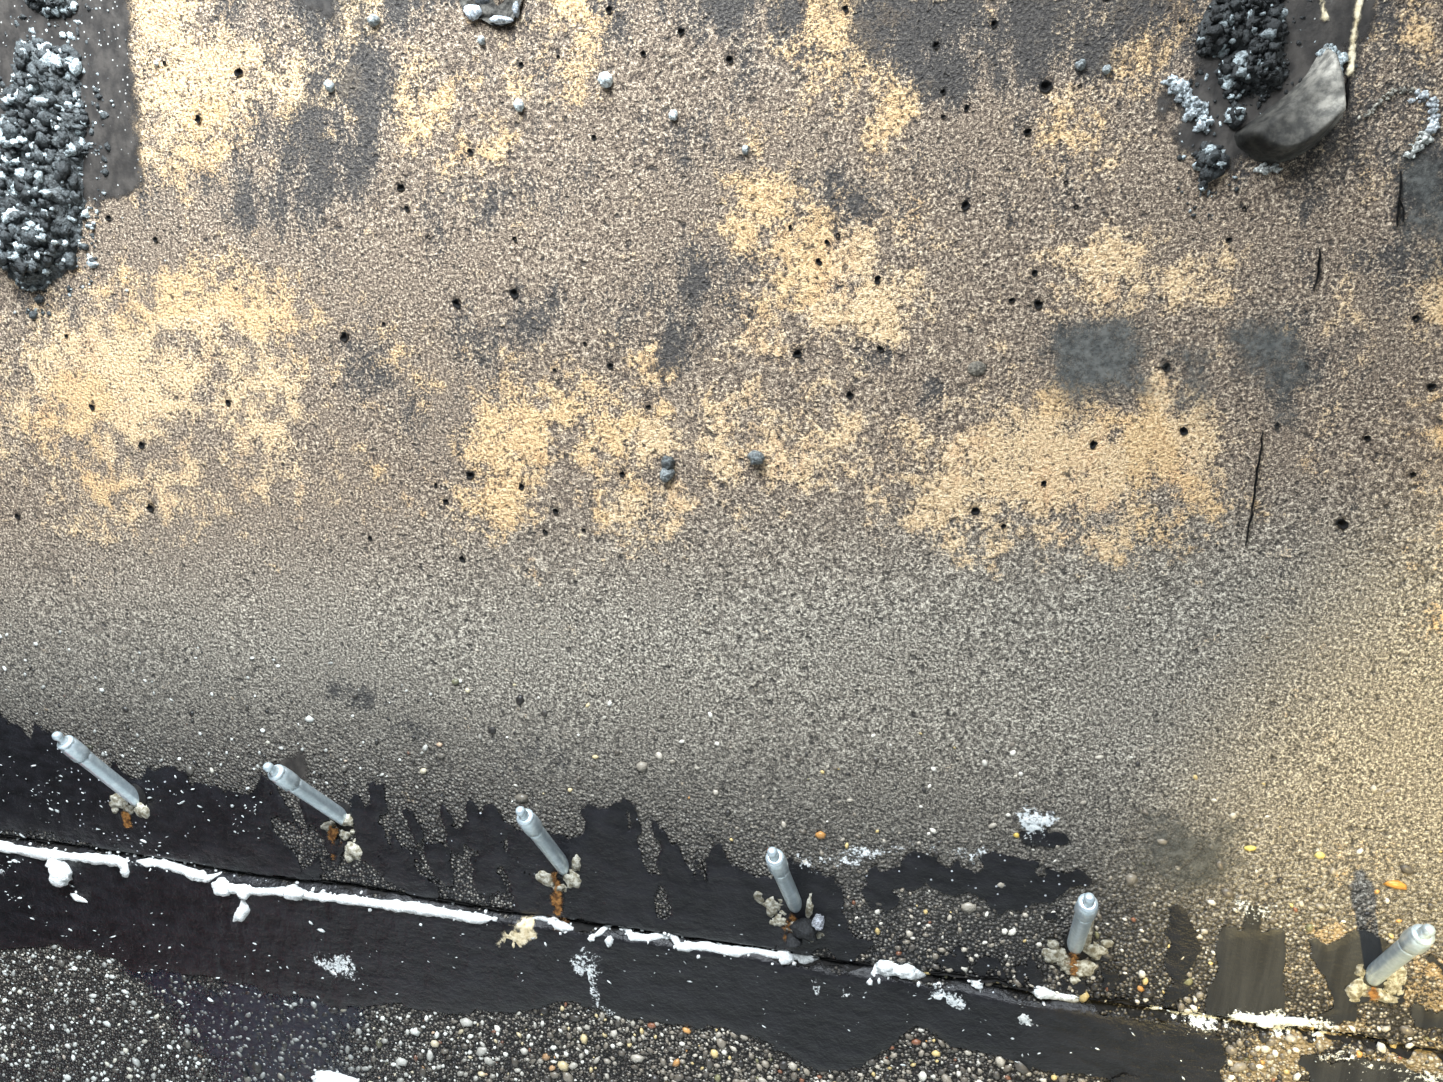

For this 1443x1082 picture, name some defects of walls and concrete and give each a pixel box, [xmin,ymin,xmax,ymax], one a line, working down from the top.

rust [121,811,131,828]
rust [550,872,570,923]
crack [0,835,1443,1061]